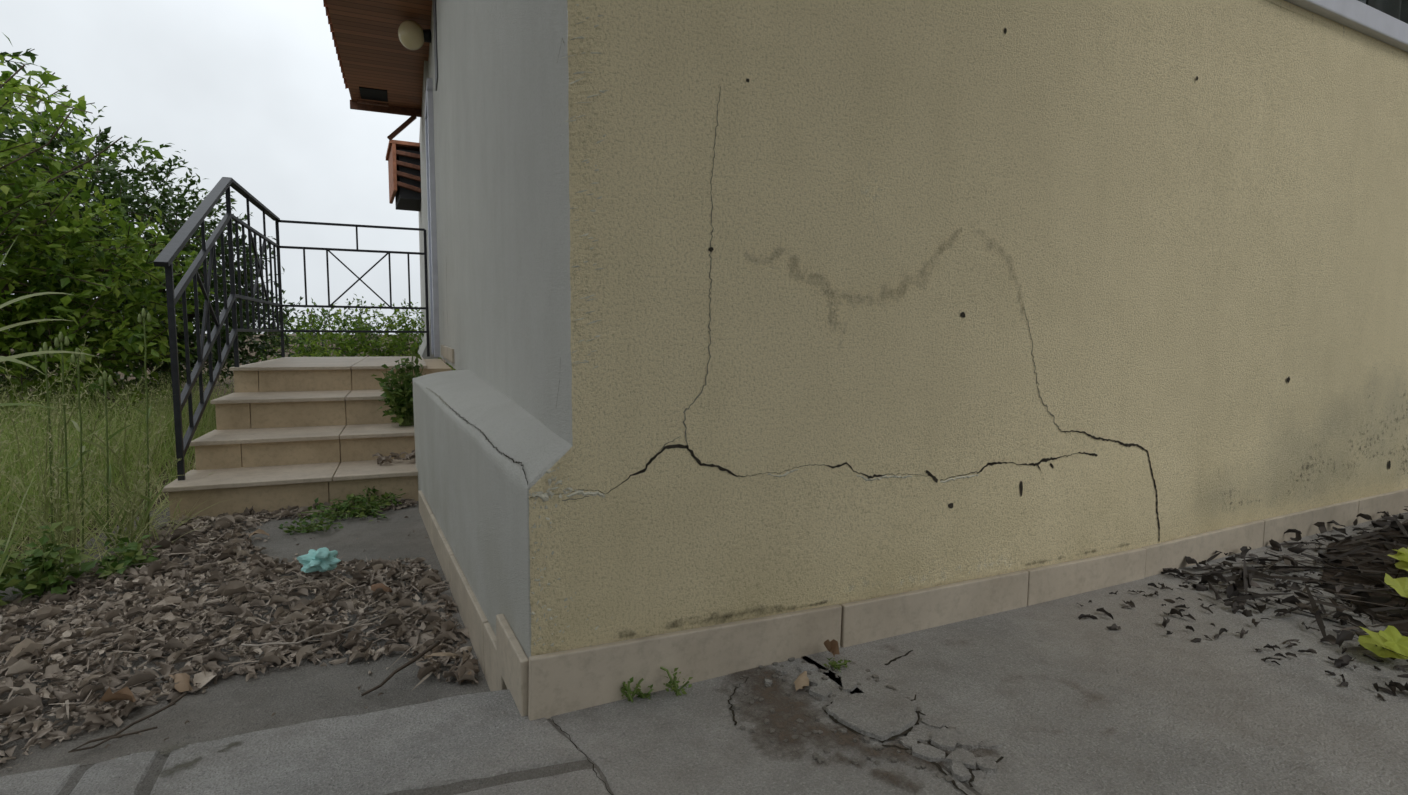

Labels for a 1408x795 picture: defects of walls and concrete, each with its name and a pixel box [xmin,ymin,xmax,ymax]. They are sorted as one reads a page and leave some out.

crack [427,86,1160,541]